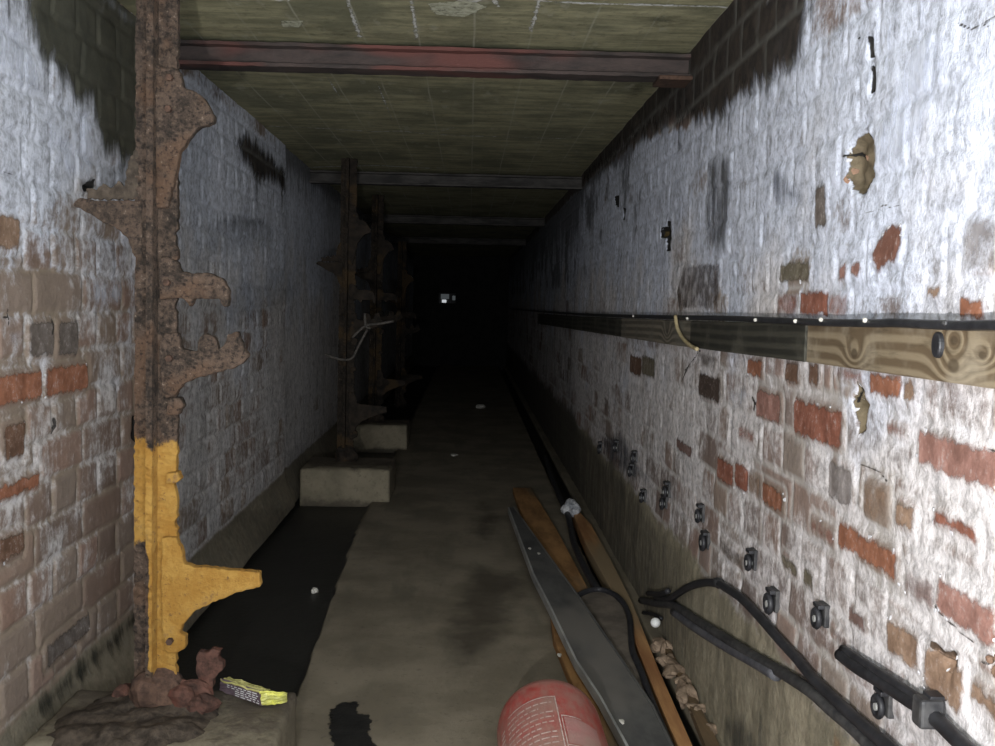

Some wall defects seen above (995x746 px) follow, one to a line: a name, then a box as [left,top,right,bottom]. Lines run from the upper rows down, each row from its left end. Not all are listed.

crack [346,0,362,37]
crack [410,1,432,38]
damp [428,0,486,17]
crack [458,0,500,8]
crack [529,0,728,31]
damp [28,0,137,165]
damp [584,0,812,182]
spalling [843,133,876,195]
damp [708,160,728,243]
peeling [785,361,818,385]
peeling [793,371,914,448]
peeling [828,461,851,506]